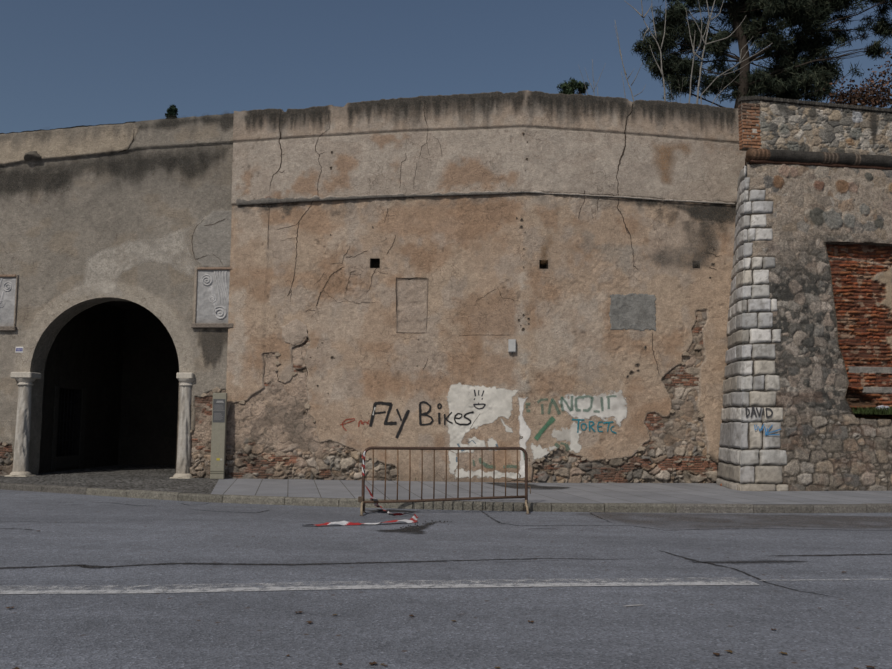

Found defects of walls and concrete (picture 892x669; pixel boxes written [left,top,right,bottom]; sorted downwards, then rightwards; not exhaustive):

leakage [349,91,734,121]
leakage [0,151,223,193]
crack [578,104,637,269]
crack [191,219,225,265]
crack [268,119,428,347]
leakage [200,328,227,366]
flaking render [189,387,226,478]
flaking render [225,338,399,481]
peeling [468,437,497,451]
peeling [448,451,520,479]
flaking render [501,309,717,483]